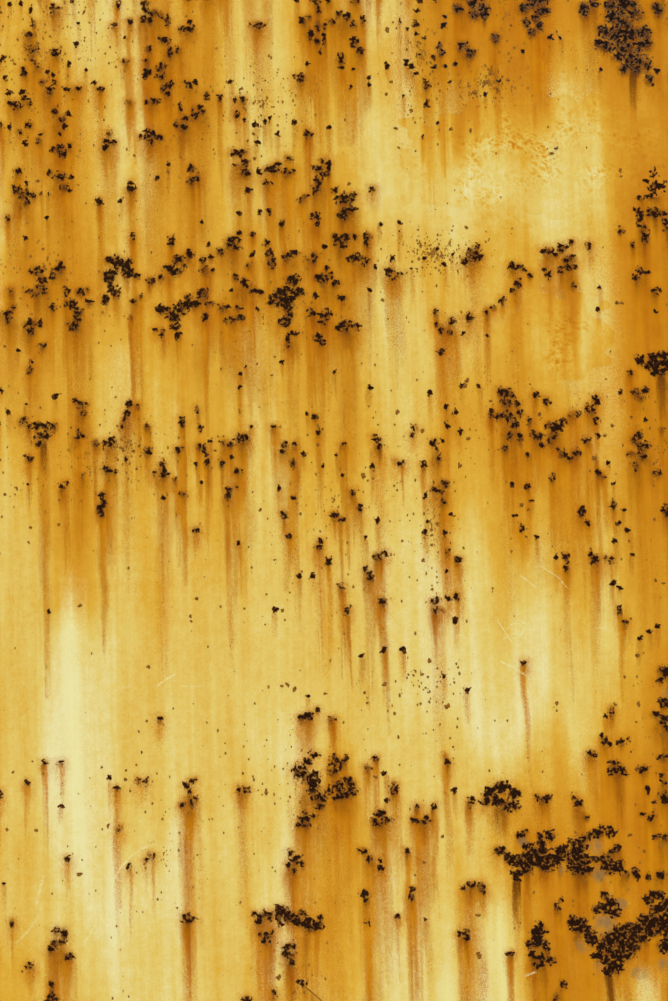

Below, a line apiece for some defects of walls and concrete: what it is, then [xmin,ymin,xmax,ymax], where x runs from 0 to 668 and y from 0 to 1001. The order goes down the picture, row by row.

corrosion [451,874,495,1001]